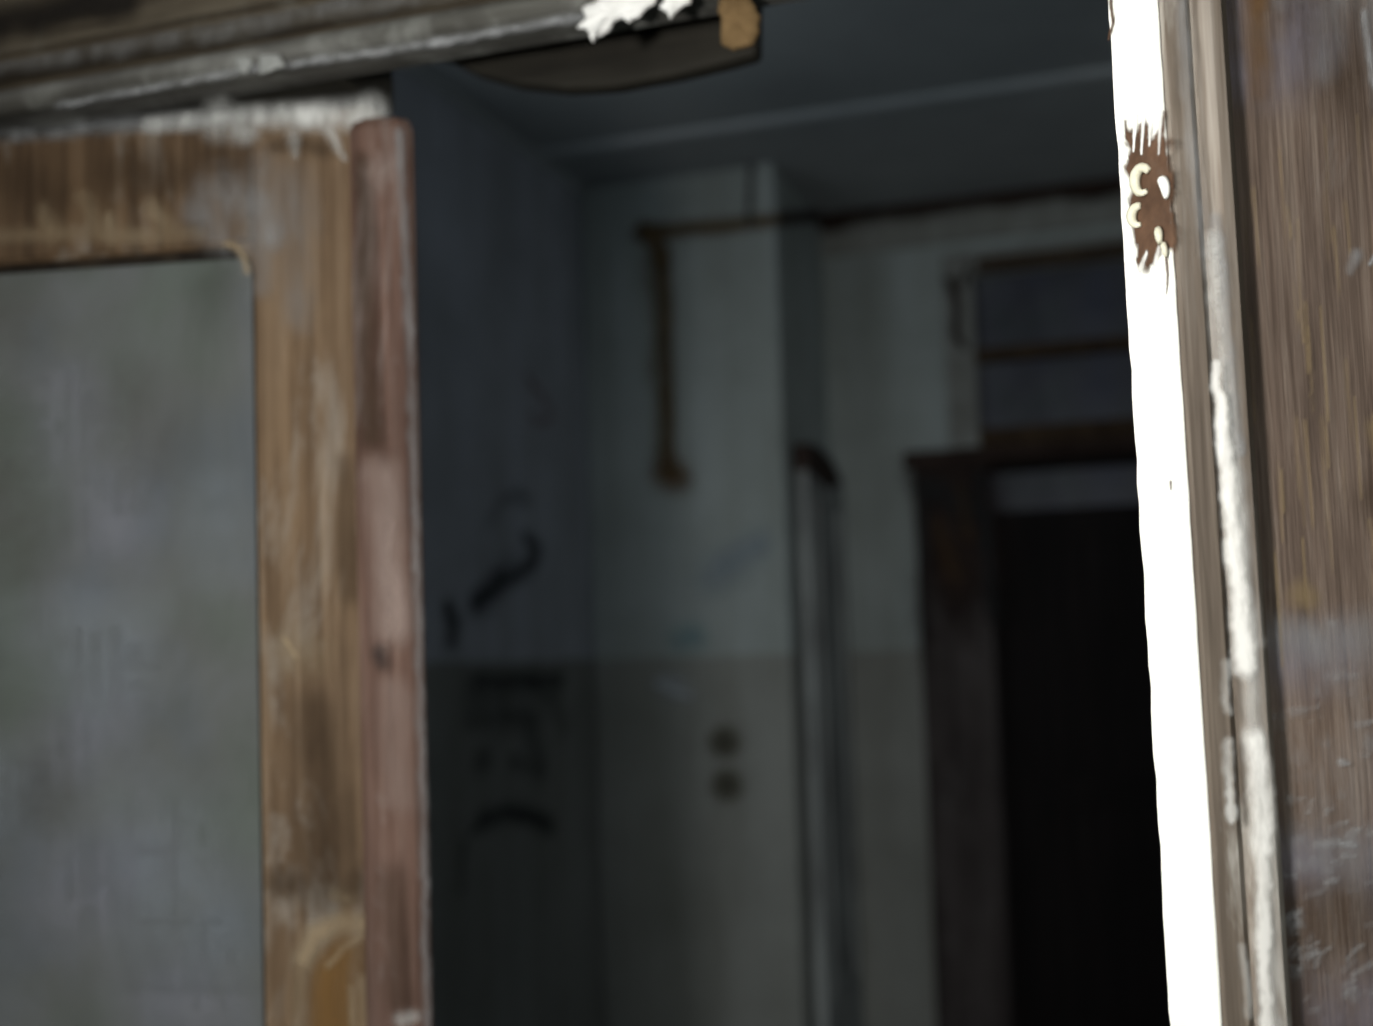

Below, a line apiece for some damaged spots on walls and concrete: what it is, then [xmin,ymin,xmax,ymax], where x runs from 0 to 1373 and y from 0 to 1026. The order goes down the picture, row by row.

peeling [577,0,692,43]
spalling [1124,111,1176,294]